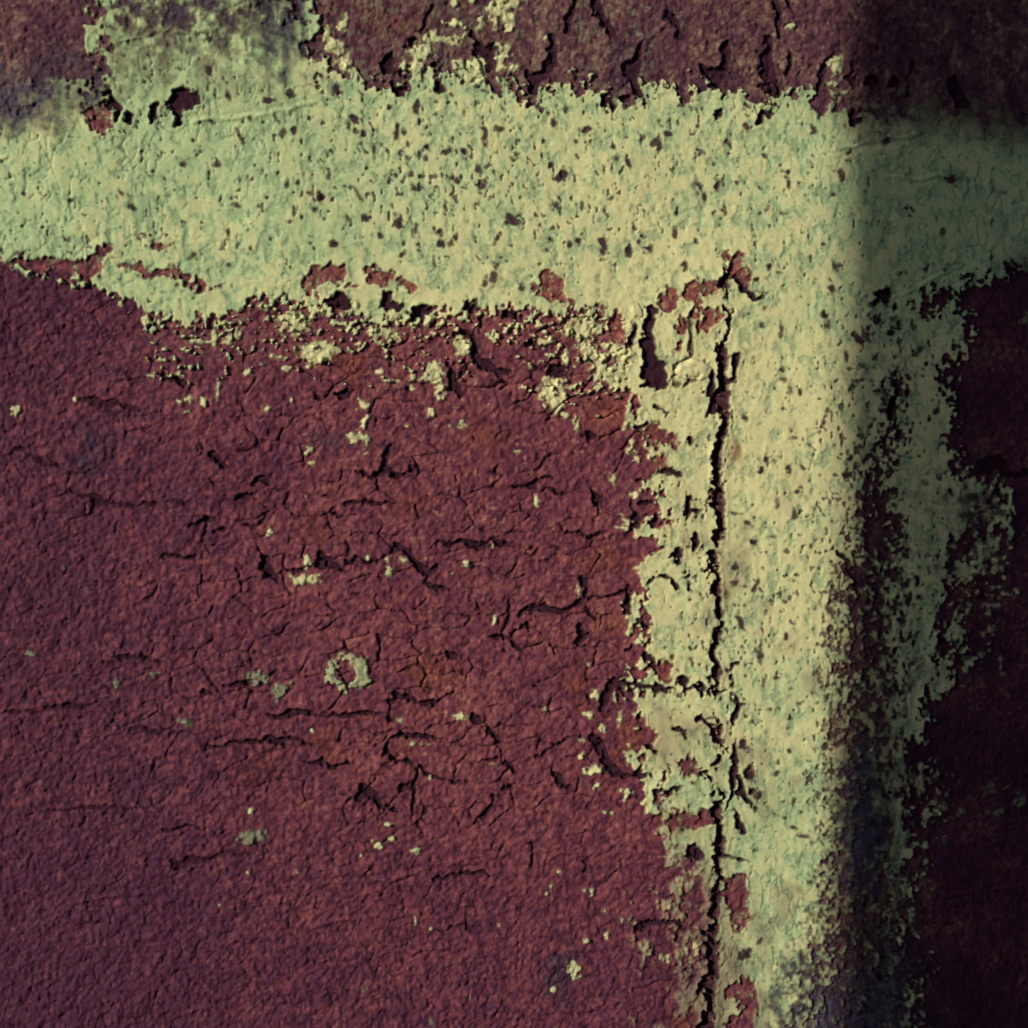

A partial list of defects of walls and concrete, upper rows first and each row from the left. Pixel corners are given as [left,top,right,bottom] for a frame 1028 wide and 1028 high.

peeling [0,0,1028,147]
peeling [13,243,113,281]
peeling [259,303,340,373]
peeling [301,261,434,343]
spalling [519,250,759,443]
crack [333,444,418,518]
crack [345,530,630,591]
crack [492,574,680,651]
peeling [780,257,1028,1028]
crack [207,691,459,815]
crack [470,652,682,824]
crack [716,661,757,861]